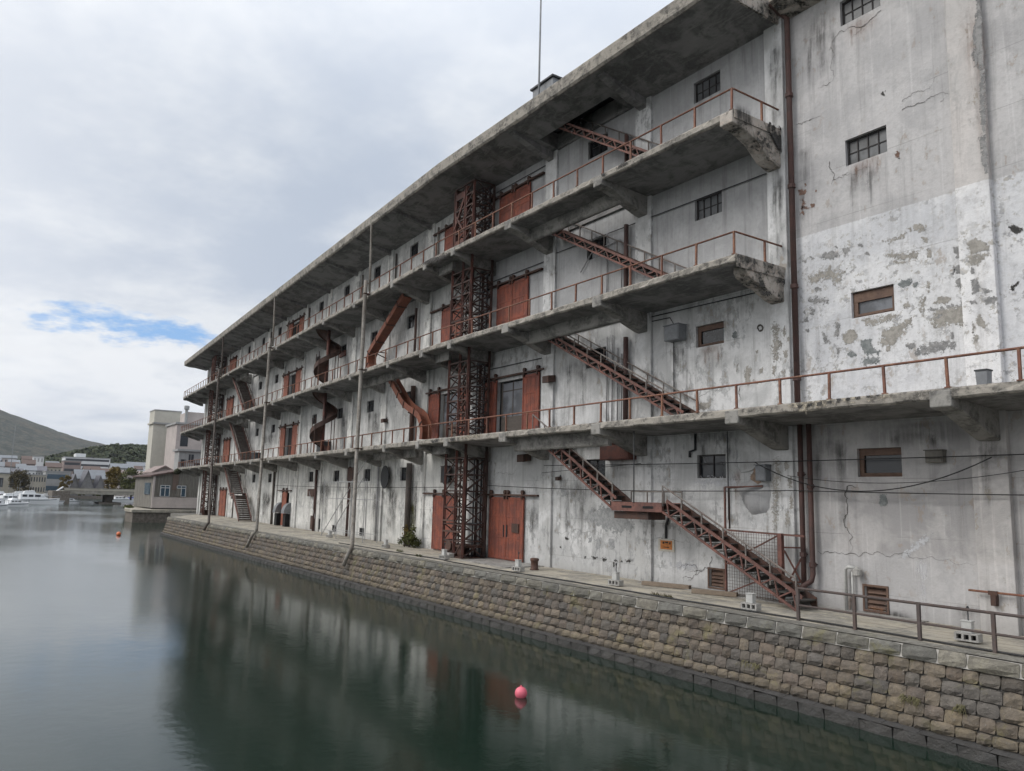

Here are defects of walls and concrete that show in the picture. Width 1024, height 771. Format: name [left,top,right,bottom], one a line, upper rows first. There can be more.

peeling [798,183,817,215]
peeling [882,223,932,266]
spalling [802,237,997,367]
crack [818,485,977,565]